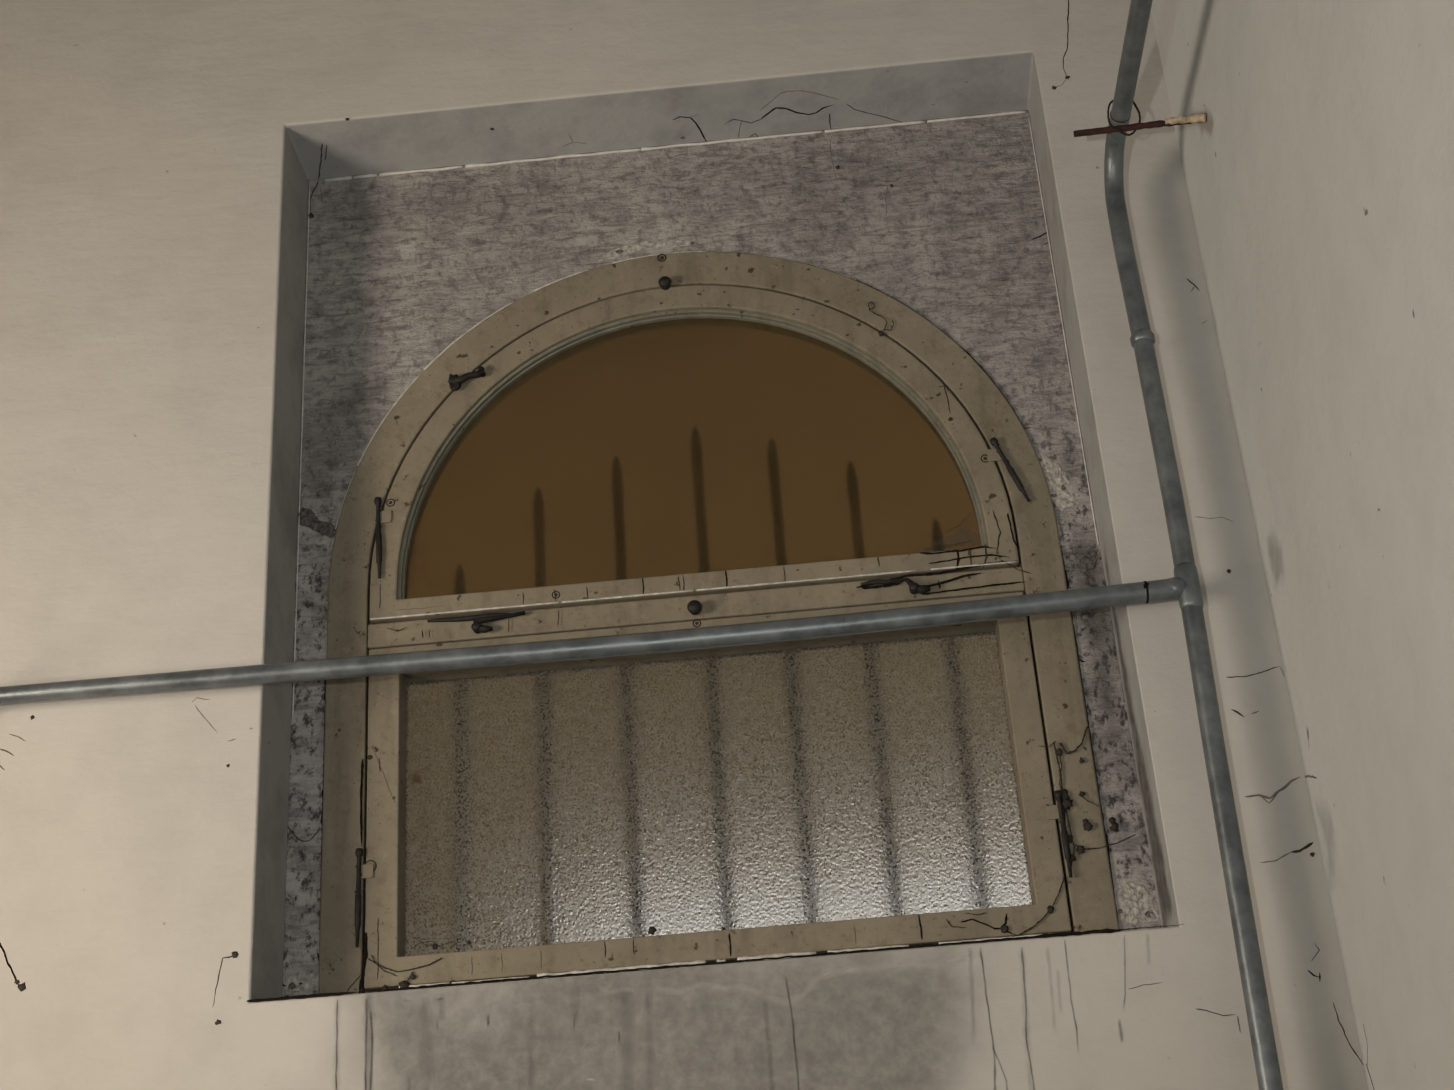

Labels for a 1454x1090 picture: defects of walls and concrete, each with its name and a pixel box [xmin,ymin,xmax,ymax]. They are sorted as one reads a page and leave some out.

crack [1052,0,1070,90]
crack [673,90,902,177]
crack [1228,666,1284,678]
crack [1245,775,1317,803]
crack [1261,842,1315,863]
crack [0,943,26,992]
leakage [393,968,921,1090]